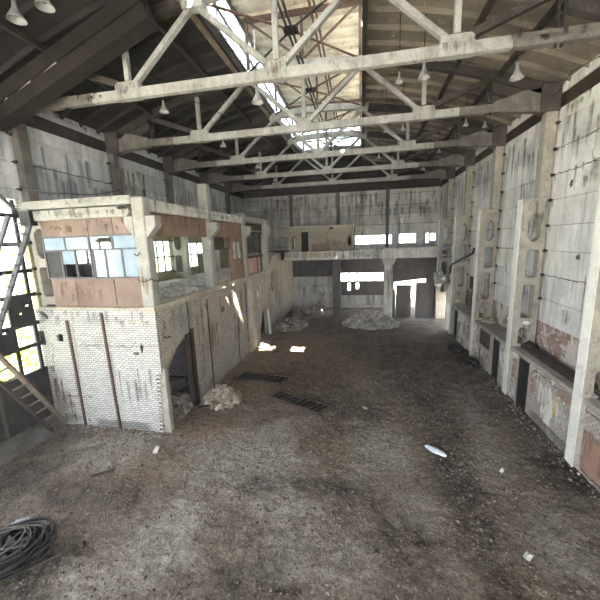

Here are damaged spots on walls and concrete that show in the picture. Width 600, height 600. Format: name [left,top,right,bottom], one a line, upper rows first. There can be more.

peeling [539,330,579,371]
peeling [557,389,571,407]